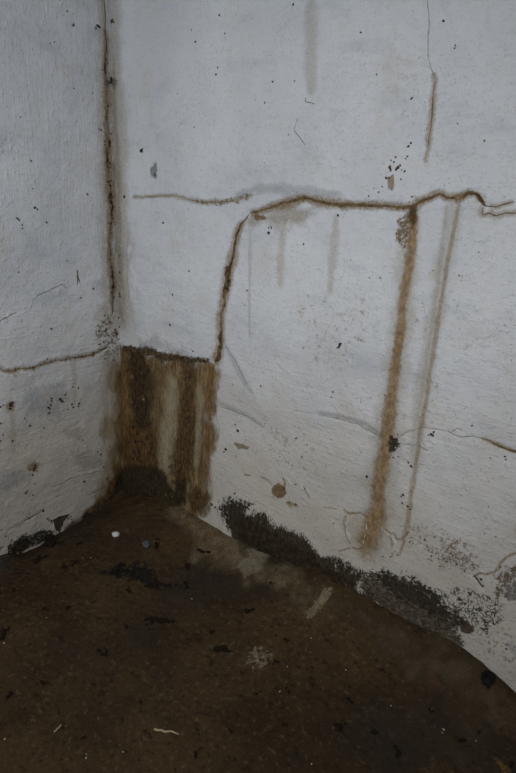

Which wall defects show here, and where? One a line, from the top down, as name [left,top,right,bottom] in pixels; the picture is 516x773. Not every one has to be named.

crack [103,2,121,313]
rust [368,142,412,197]
crack [425,66,435,158]
crack [148,191,516,363]
crack [0,346,109,373]
water stain [1,361,122,554]
rust [360,196,417,556]
crack [397,427,516,460]
water stain [217,496,503,647]